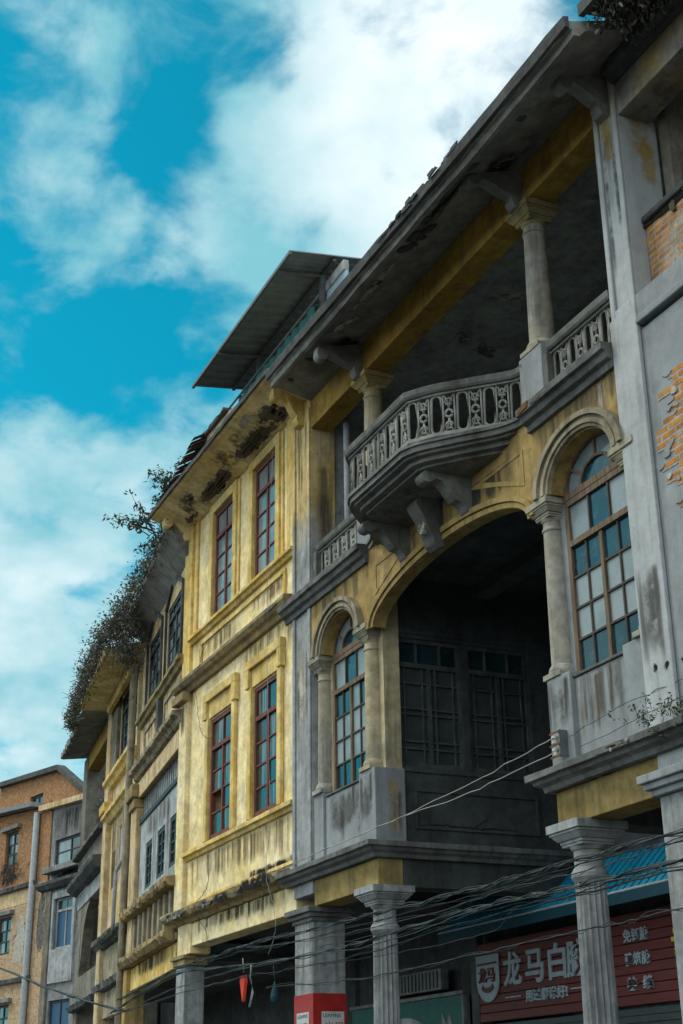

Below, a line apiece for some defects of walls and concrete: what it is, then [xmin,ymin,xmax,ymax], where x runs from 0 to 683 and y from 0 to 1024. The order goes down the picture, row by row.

peeling [397,216,437,253]
flaking render [656,362,683,508]
water stain [640,568,662,641]
water stain [333,776,371,827]
water stain [198,819,292,931]